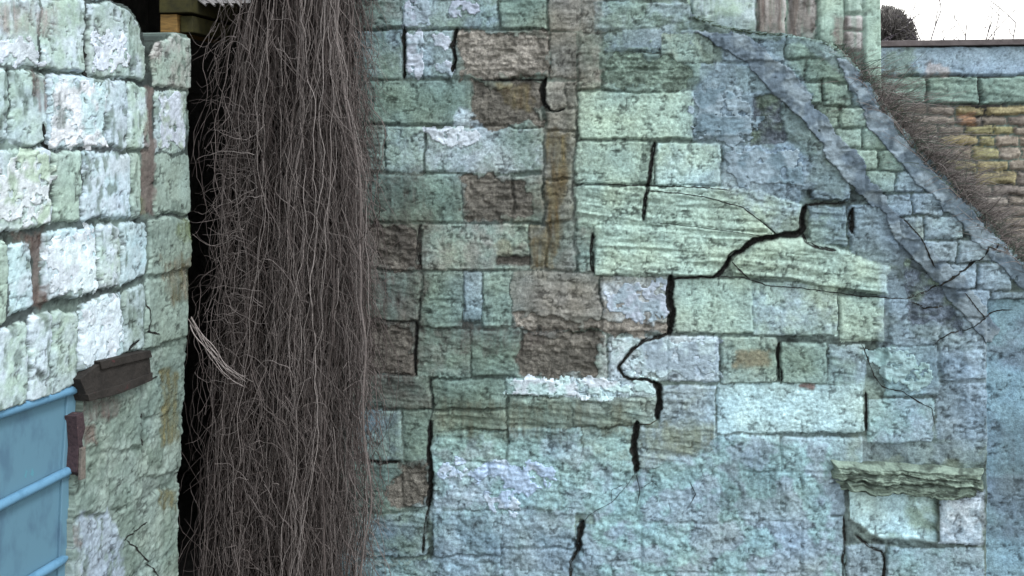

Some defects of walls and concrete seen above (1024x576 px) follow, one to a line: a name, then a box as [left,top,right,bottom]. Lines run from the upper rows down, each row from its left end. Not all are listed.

crack [399,27,407,78]
crack [450,29,458,72]
crack [480,78,565,112]
crack [569,142,1008,576]
crack [422,420,433,553]